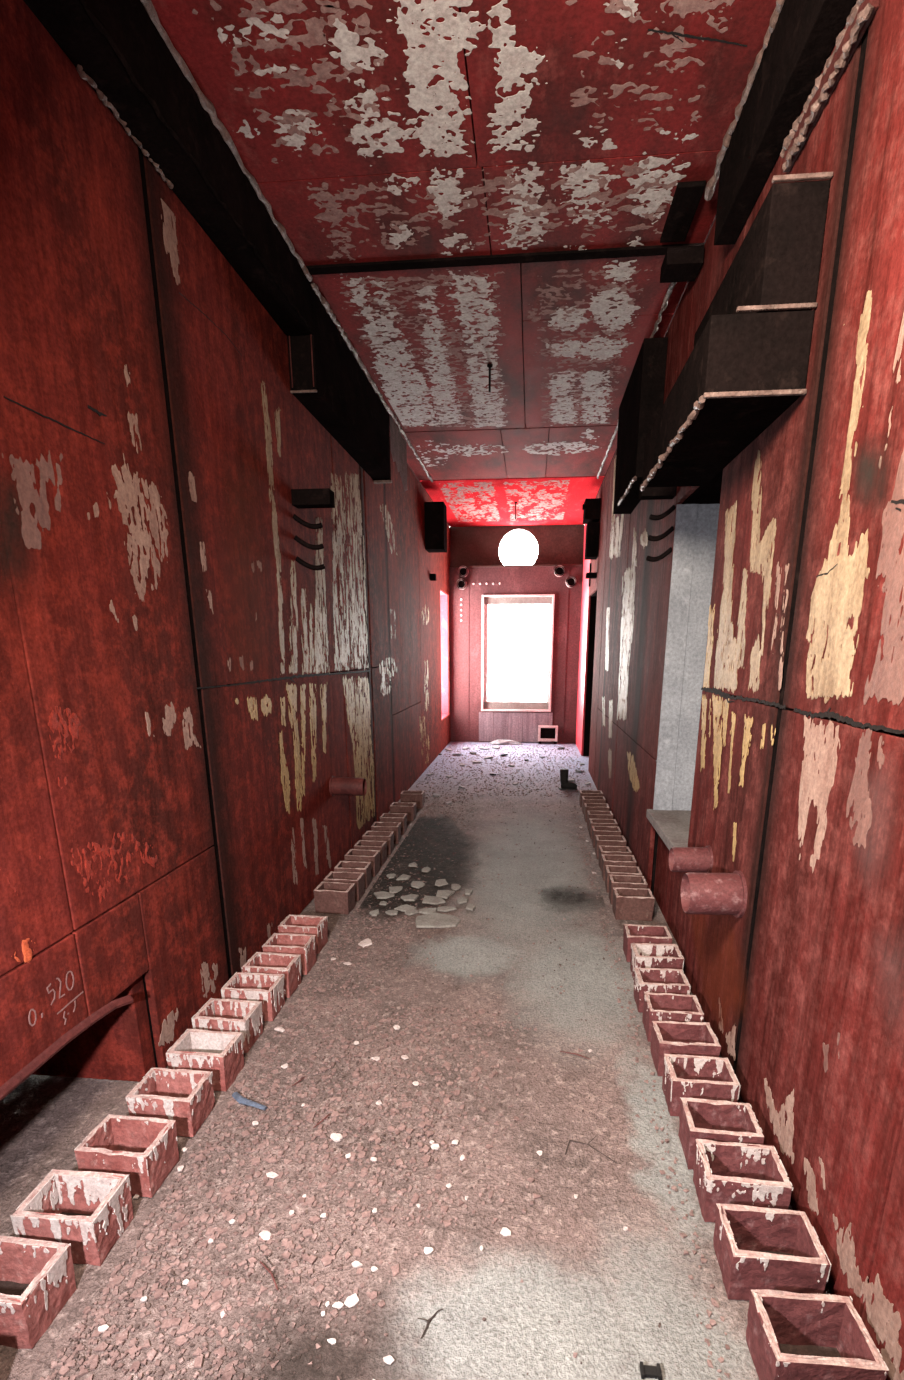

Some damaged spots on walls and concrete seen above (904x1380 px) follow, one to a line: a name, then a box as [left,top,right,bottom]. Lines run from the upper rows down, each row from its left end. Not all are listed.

peeling [192,0,735,467]
peeling [2,451,63,550]
peeling [87,411,168,631]
peeling [188,471,197,503]
peeling [235,381,398,885]
peeling [420,661,430,764]
peeling [439,480,570,522]
peeling [602,459,648,792]
peeling [701,450,789,810]
peeling [798,290,904,873]
peeling [764,1078,904,1380]